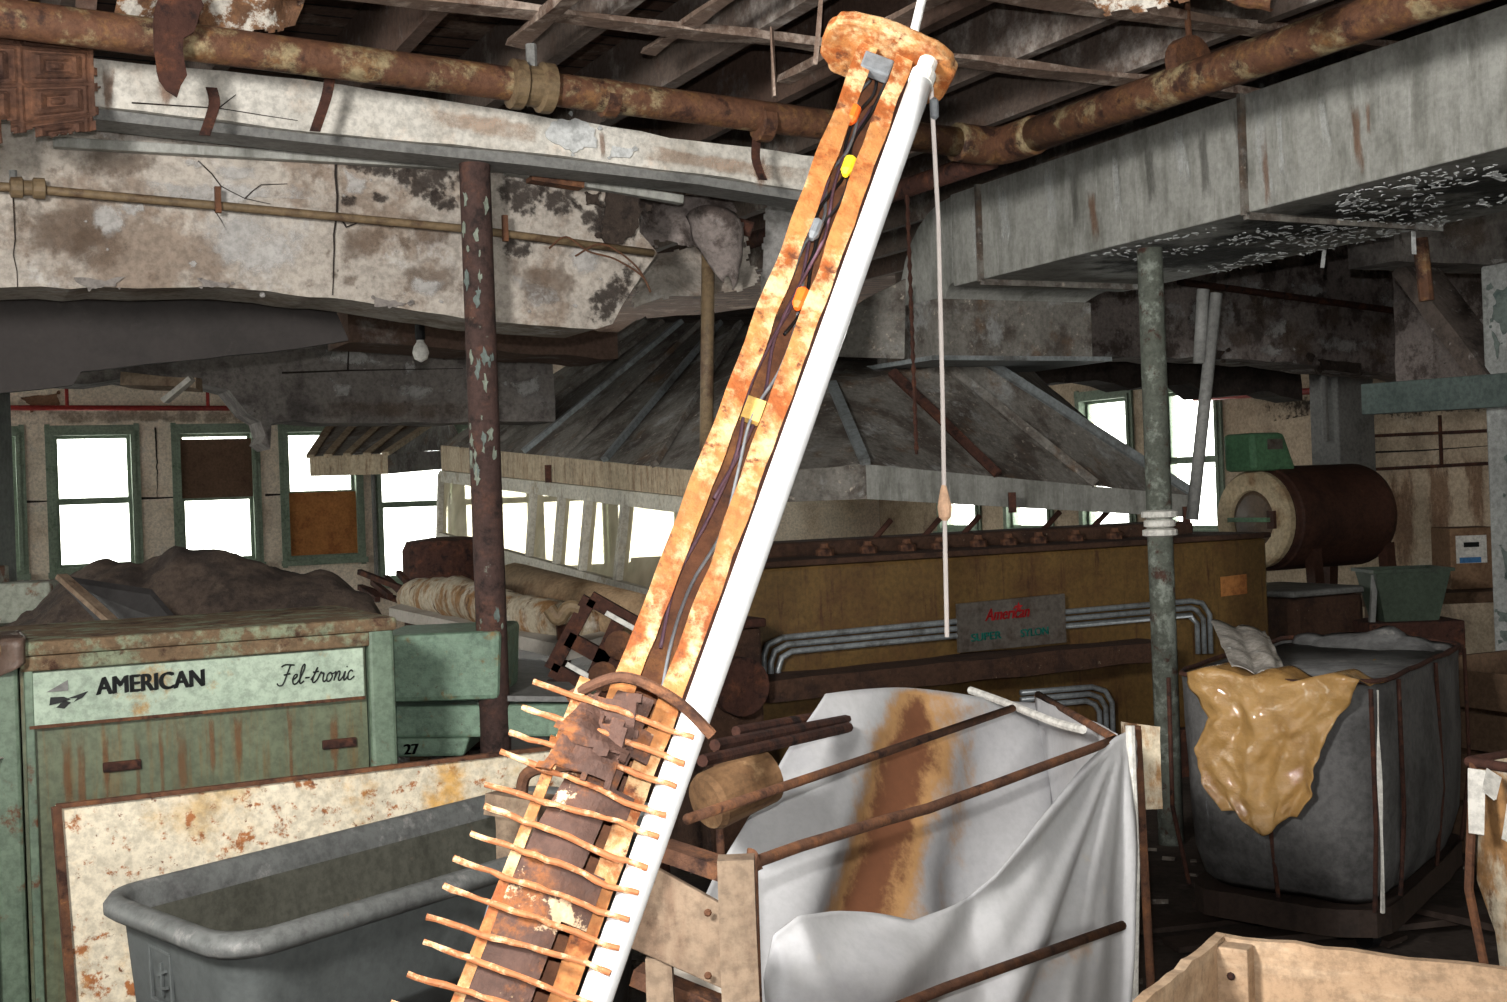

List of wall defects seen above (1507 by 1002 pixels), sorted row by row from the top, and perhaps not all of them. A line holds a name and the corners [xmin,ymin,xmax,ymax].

damp [504,238,534,258]
damp [497,176,606,234]
peeling [1090,161,1507,290]
damp [589,266,641,322]
peeling [1486,283,1507,359]
peeling [1495,609,1507,644]